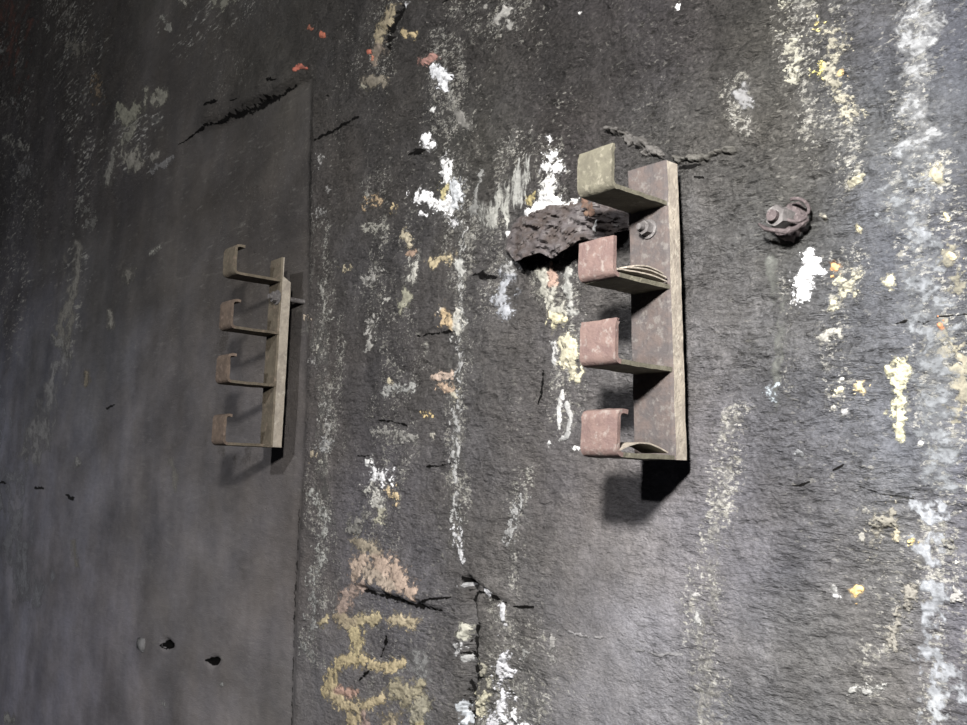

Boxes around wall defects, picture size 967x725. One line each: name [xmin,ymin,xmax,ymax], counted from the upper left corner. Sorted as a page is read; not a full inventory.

leakage [483,4,514,30]
crack [178,77,297,145]
leakage [419,132,436,150]
crack [679,163,704,179]
leakage [782,247,863,312]
leakage [858,0,967,567]
leakage [361,135,585,564]
leakage [816,327,843,342]
crack [359,635,388,681]
crack [364,576,534,723]
leakage [452,622,546,725]
leakage [883,576,967,725]